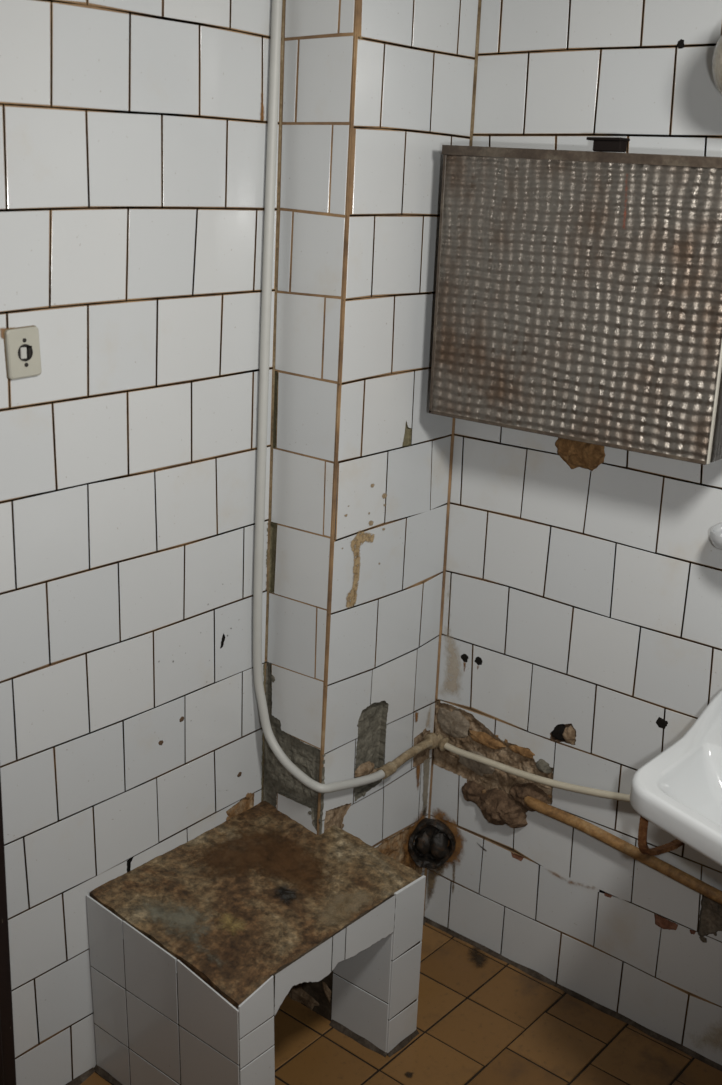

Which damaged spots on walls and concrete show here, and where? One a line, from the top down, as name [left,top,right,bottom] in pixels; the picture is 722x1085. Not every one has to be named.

peeling [402,421,412,447]
peeling [261,661,389,835]
spalling [413,700,553,828]
hole [550,723,576,745]
peeling [654,914,678,930]
spalling [690,895,722,943]